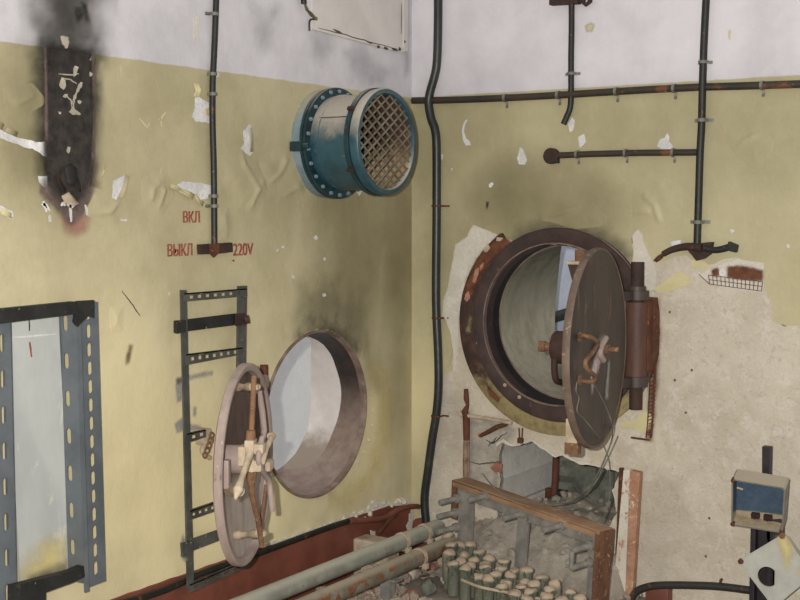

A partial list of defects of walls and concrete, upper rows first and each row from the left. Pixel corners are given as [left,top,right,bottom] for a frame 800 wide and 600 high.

peeling [192,83,209,123]
peeling [0,122,45,156]
peeling [241,124,253,156]
peeling [517,147,527,165]
peeling [112,175,129,200]
peeling [170,182,211,207]
corrosion [464,235,510,301]
peeling [420,225,800,600]
flaking render [264,497,412,547]